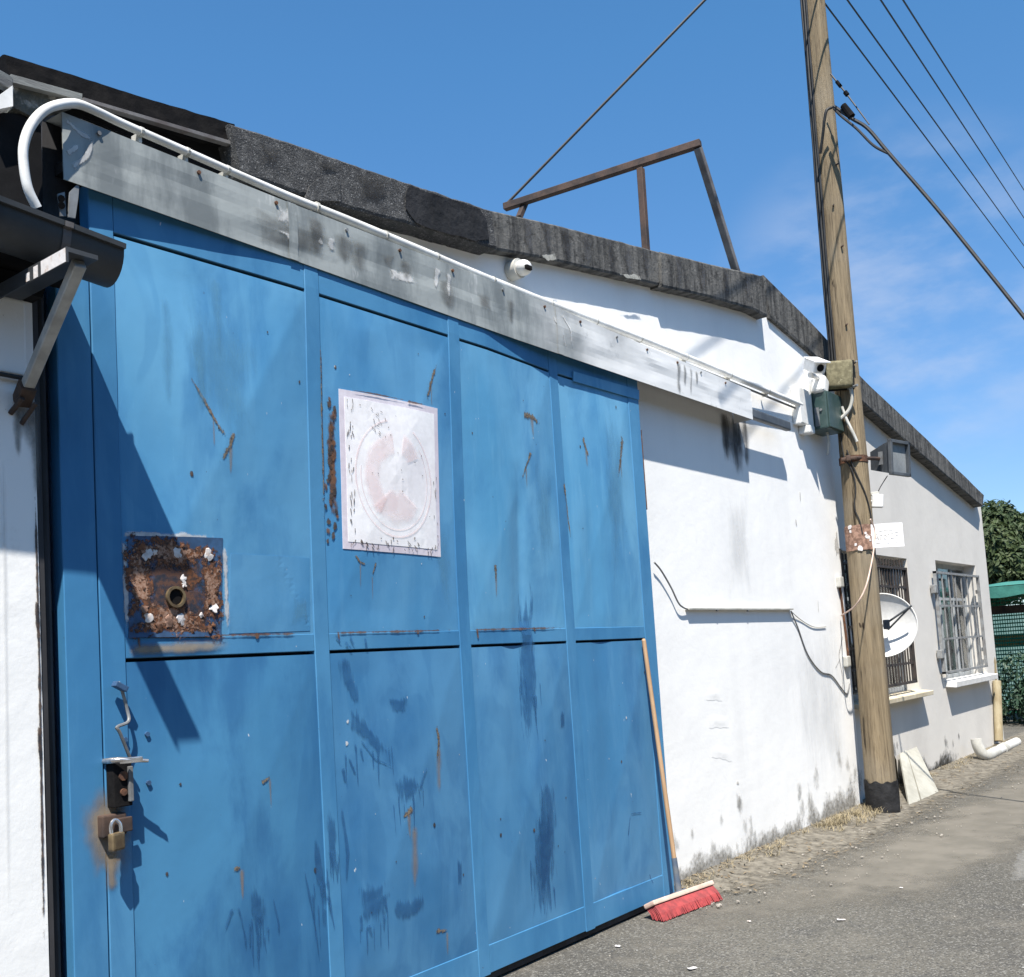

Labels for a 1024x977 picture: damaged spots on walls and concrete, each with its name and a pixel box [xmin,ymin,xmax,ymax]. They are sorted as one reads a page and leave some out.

rust [191,378,235,458]
rust [320,347,339,543]
leakage [723,416,748,465]
rust [121,531,293,653]
rust [338,630,439,640]
rust [476,627,554,638]
rust [91,801,120,887]
leakage [673,852,734,881]
leakage [746,789,855,852]